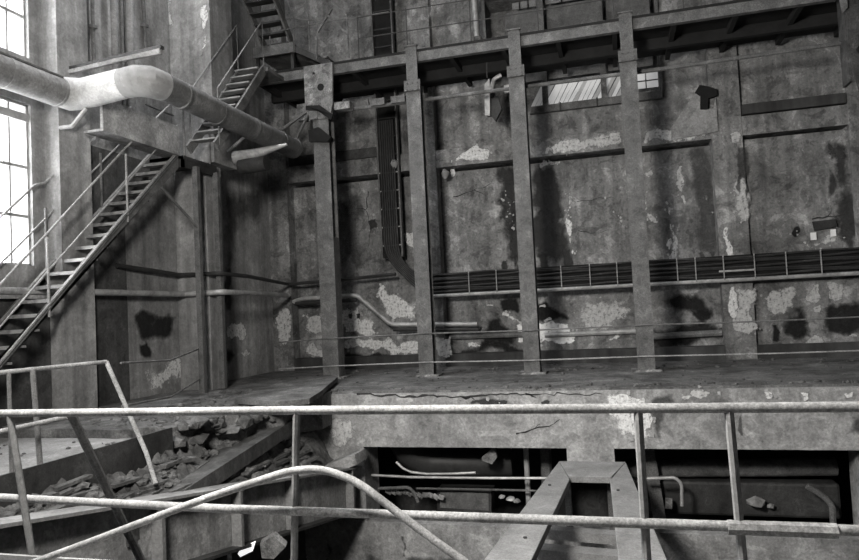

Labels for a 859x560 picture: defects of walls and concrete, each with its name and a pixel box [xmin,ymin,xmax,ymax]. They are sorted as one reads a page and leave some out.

spalling [540,132,621,168]
spalling [644,126,705,144]
water stain [532,166,573,267]
peeling [342,308,418,355]
peeling [376,283,416,322]
peeling [502,310,523,342]
peeling [539,296,631,347]
peeling [728,281,844,335]
spalling [305,385,859,560]